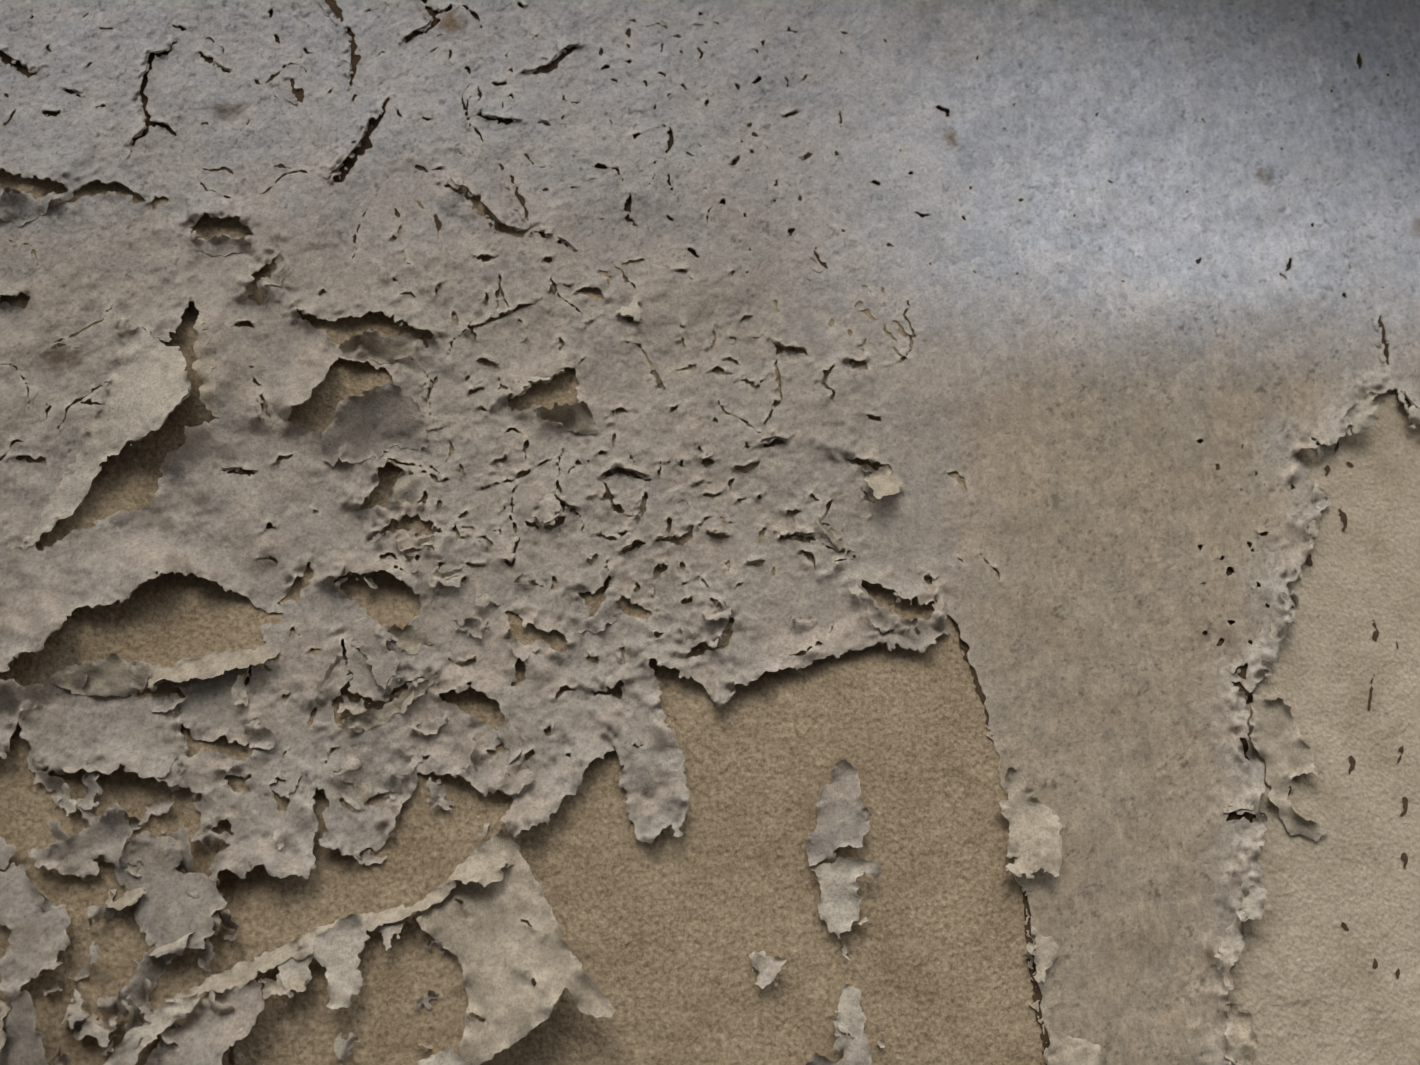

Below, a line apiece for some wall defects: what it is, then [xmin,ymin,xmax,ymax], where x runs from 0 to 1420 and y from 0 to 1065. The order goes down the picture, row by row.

crack [398,0,482,43]
crack [517,0,528,8]
crack [0,25,305,158]
crack [274,0,390,183]
peeling [0,169,168,259]
peeling [187,213,253,257]
crack [392,165,578,252]
peeling [0,292,30,309]
peeling [449,255,532,351]
peeling [544,257,645,329]
peeling [0,301,1109,1065]
peeling [1213,389,1420,1065]